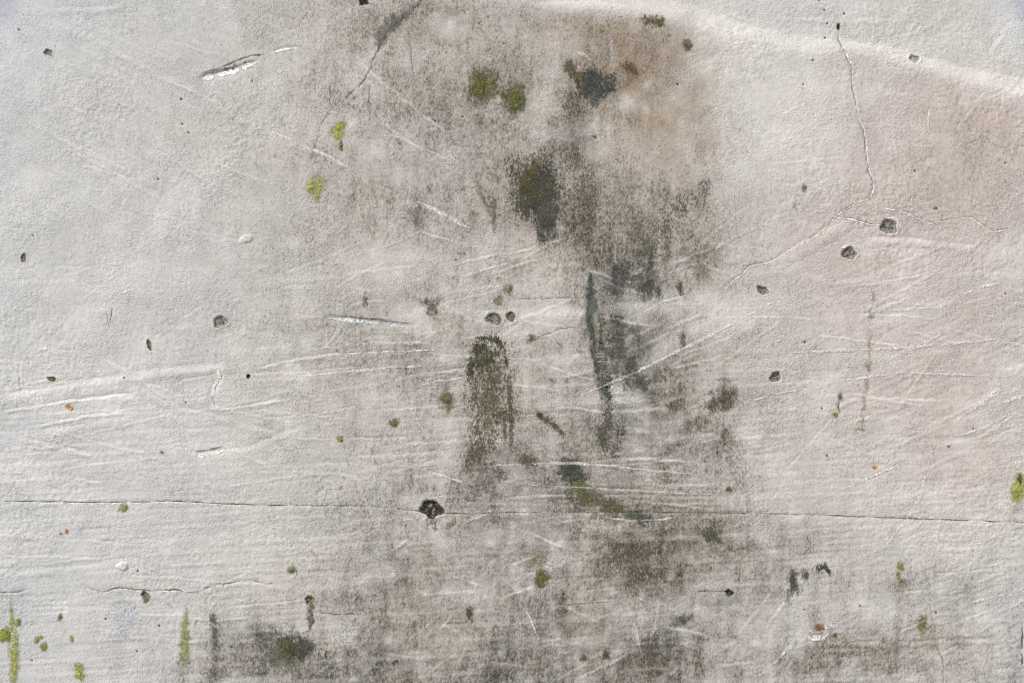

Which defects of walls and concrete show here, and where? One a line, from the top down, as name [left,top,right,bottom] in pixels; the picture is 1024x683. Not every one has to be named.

crack [722,35,1005,296]
water stain [503,376,514,446]
crack [5,501,419,512]
spalling [419,496,445,529]
crack [444,509,541,517]
crack [655,512,1023,523]